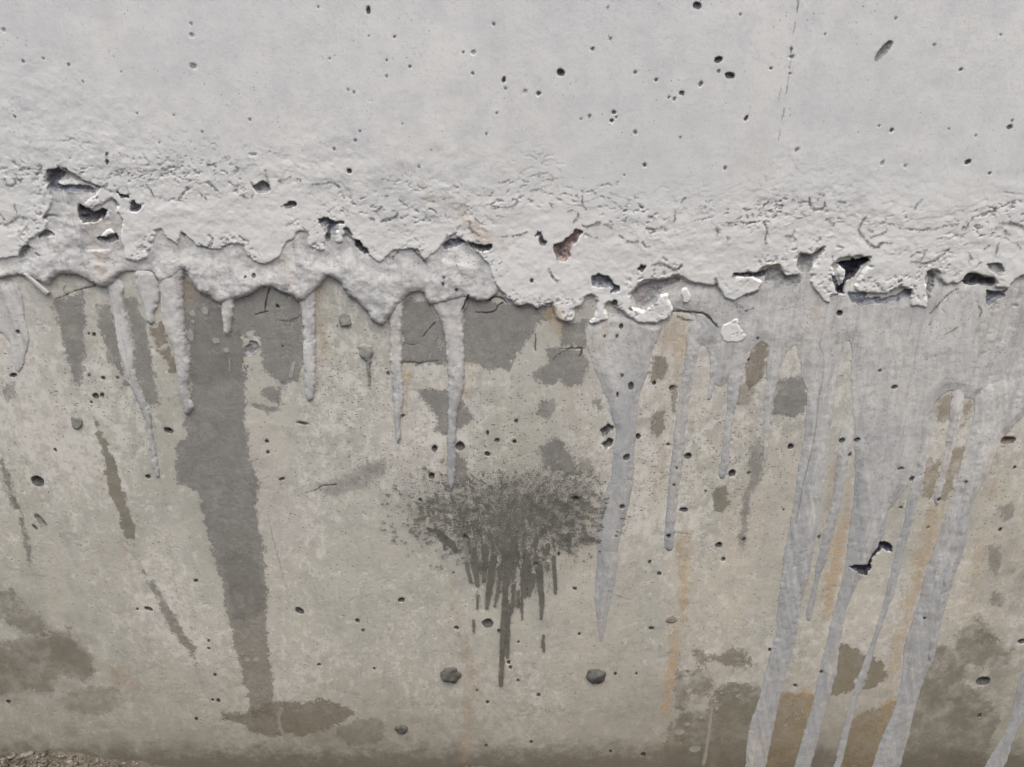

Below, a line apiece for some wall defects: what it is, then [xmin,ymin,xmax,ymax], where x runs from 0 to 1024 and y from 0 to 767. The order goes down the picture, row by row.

spalling [35,154,142,223]
spalling [318,207,369,254]
spalling [442,190,611,261]
spalling [632,257,683,310]
spalling [732,210,1024,312]
spalling [910,245,1019,325]
water stain [51,292,176,405]
water stain [463,298,589,387]
water stain [94,421,135,539]
water stain [174,274,355,737]
water stain [381,438,631,687]
water stain [831,643,888,696]